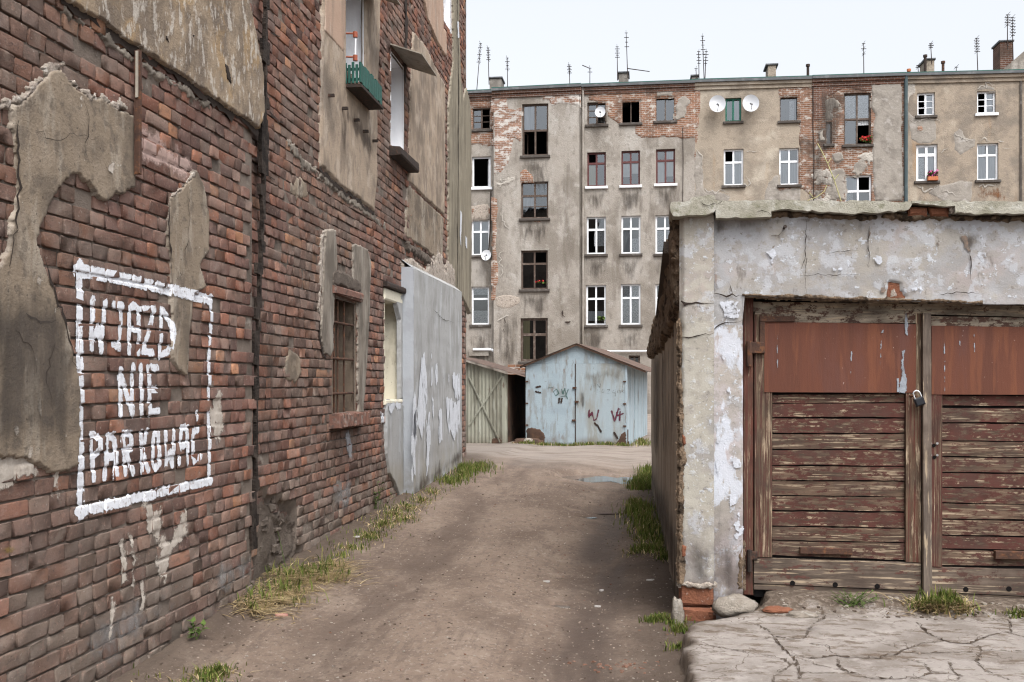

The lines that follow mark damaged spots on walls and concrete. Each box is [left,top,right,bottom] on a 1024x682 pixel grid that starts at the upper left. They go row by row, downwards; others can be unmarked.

peeling [60,0,265,136]
peeling [404,0,535,321]
flaking render [542,90,703,165]
peeling [765,84,1024,246]
peeling [0,61,135,473]
peeling [164,169,209,375]
crack [249,0,283,551]
peeling [411,352,460,481]
peeling [714,458,741,482]
crack [801,225,870,291]
spalling [720,282,985,335]
peeling [897,350,907,393]